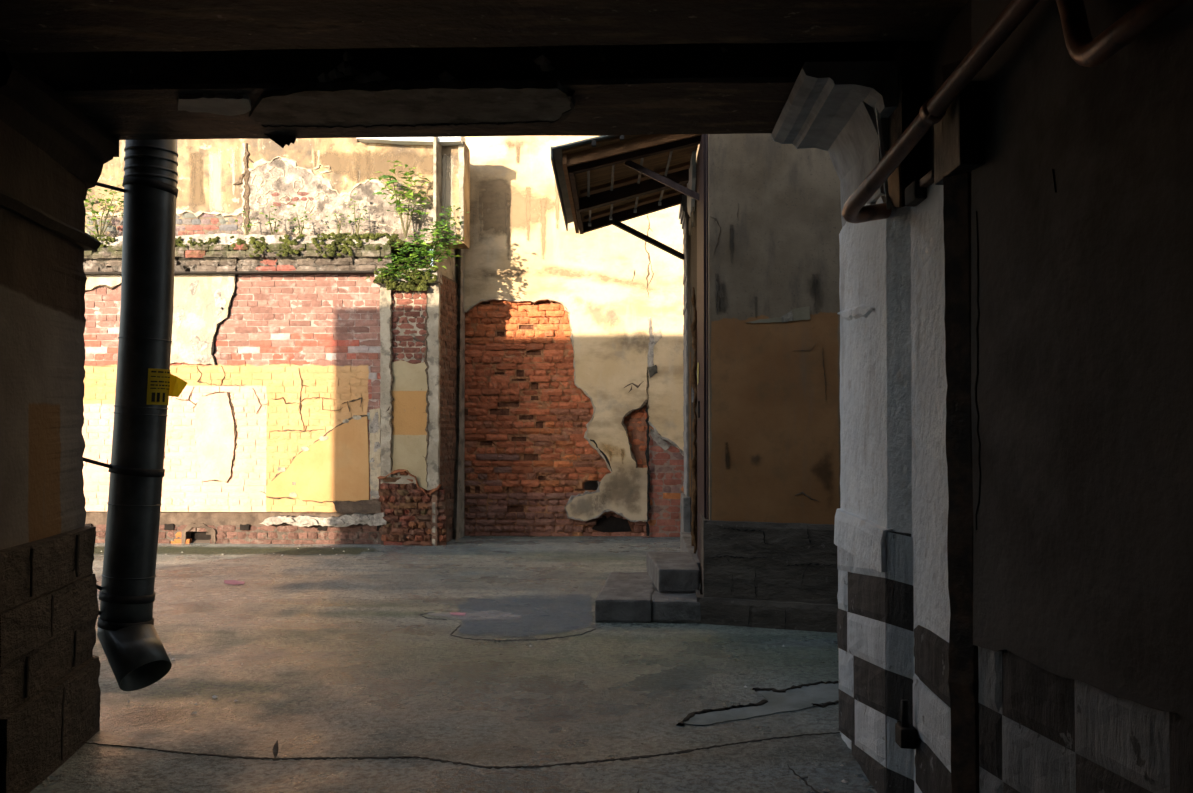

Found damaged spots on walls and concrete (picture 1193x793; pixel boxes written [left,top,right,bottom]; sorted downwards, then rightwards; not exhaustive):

flaking render [86,211,123,237]
flaking render [175,156,457,243]
damp [477,179,559,256]
damp [545,267,584,277]
crack [632,215,654,296]
flaking render [170,274,238,365]
crack [176,290,394,470]
crack [422,290,430,487]
flaking render [464,298,684,537]
flaking render [266,408,447,546]